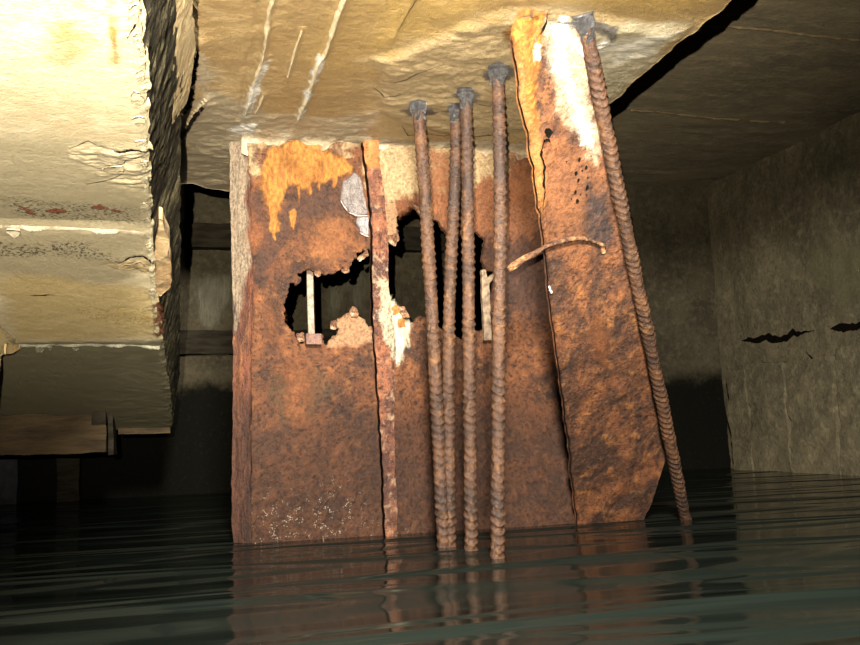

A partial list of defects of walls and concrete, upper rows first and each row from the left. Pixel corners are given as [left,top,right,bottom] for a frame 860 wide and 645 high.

water stain [230,62,268,136]
water stain [297,54,325,120]
rust [503,9,548,120]
rust [21,207,66,216]
peeling [0,0,172,344]
rust [249,140,352,246]
rust [428,147,450,194]
spalling [409,87,479,551]
spalling [487,62,509,559]
spalling [571,11,692,520]